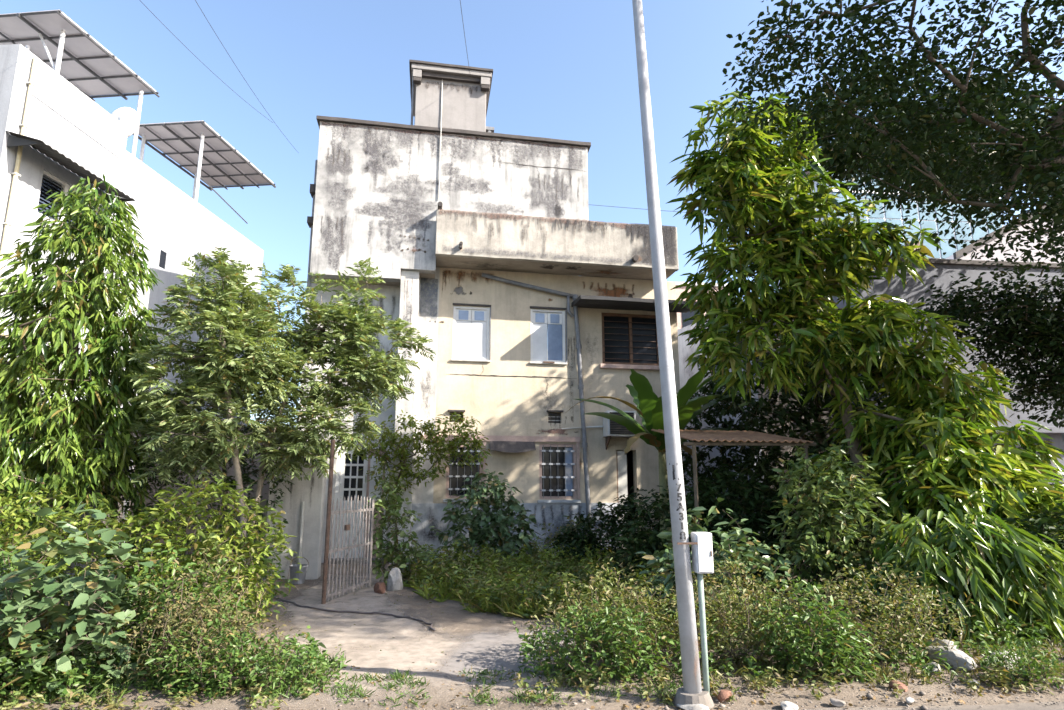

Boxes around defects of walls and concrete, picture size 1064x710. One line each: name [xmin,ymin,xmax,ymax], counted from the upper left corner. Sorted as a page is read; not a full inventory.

leakage [321,125,353,269]
leakage [358,131,677,267]
rust [583,271,634,297]